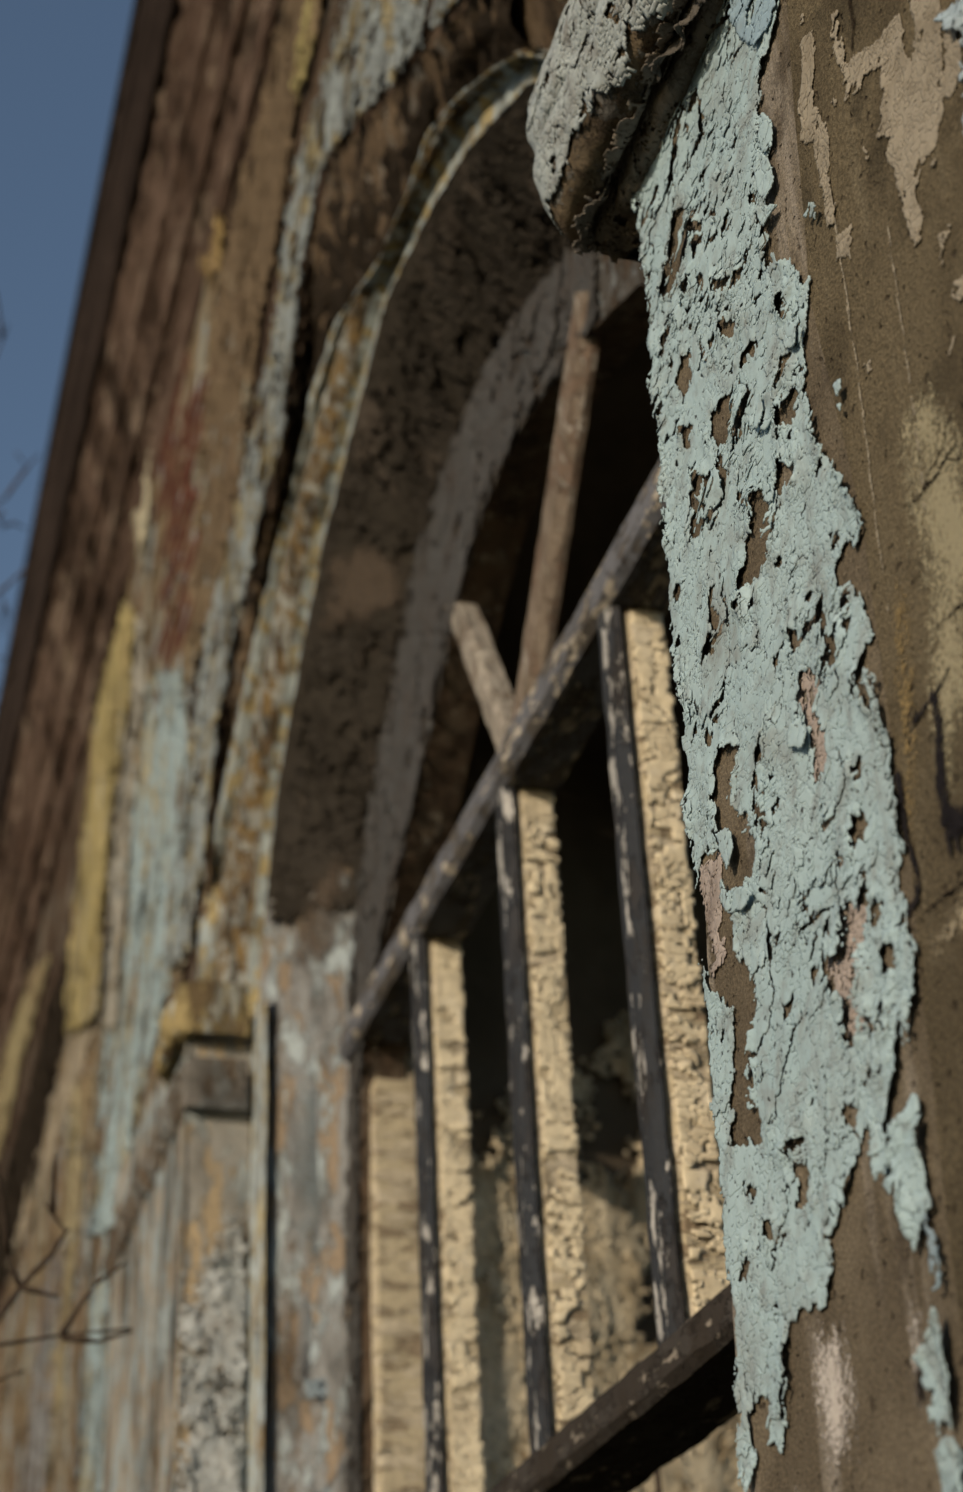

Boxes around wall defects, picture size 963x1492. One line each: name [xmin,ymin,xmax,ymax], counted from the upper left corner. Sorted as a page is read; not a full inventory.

peeling [152,0,917,1492]